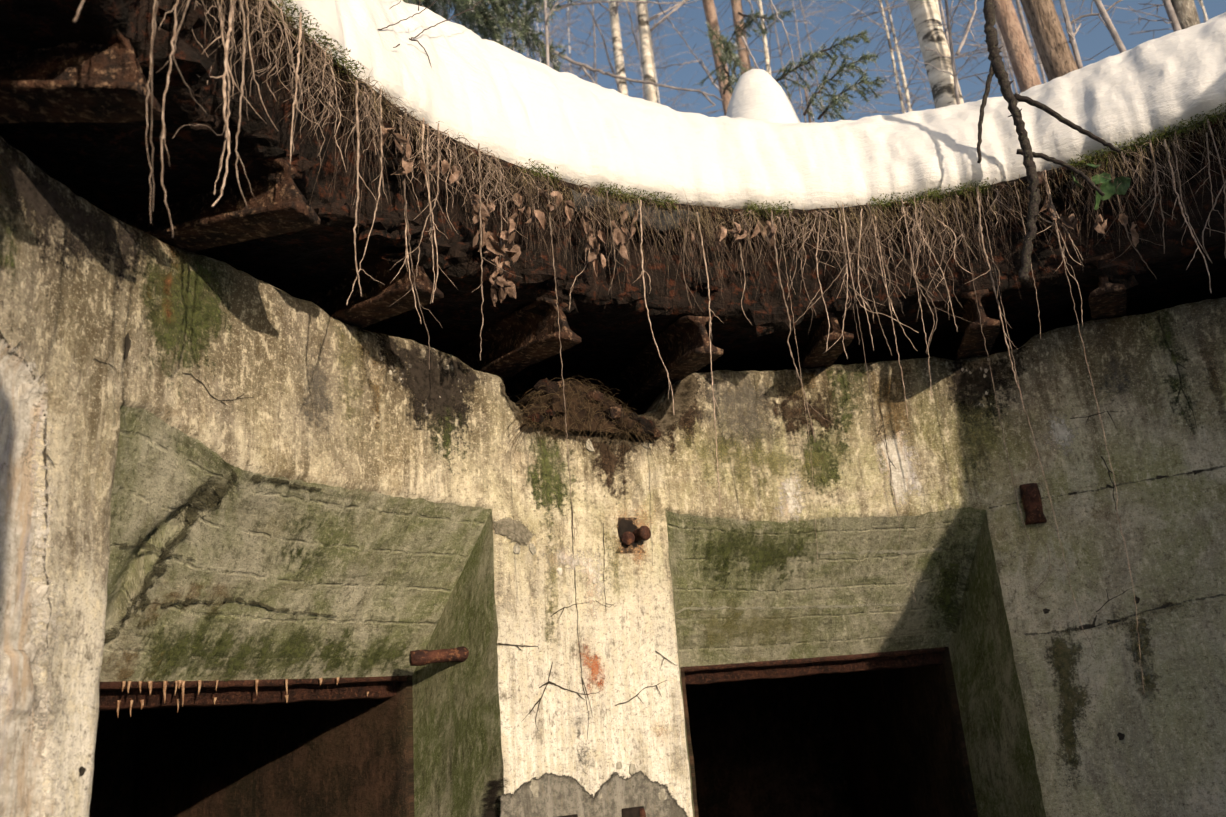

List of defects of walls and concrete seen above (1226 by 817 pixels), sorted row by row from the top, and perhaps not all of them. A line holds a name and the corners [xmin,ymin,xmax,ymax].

damp [359,328,488,457]
damp [652,370,852,489]
crack [1070,411,1118,430]
damp [531,470,567,524]
damp [579,432,639,500]
crack [1101,456,1120,522]
crack [104,467,337,643]
crack [497,505,677,735]
rust [581,647,605,690]
spalling [482,762,688,817]